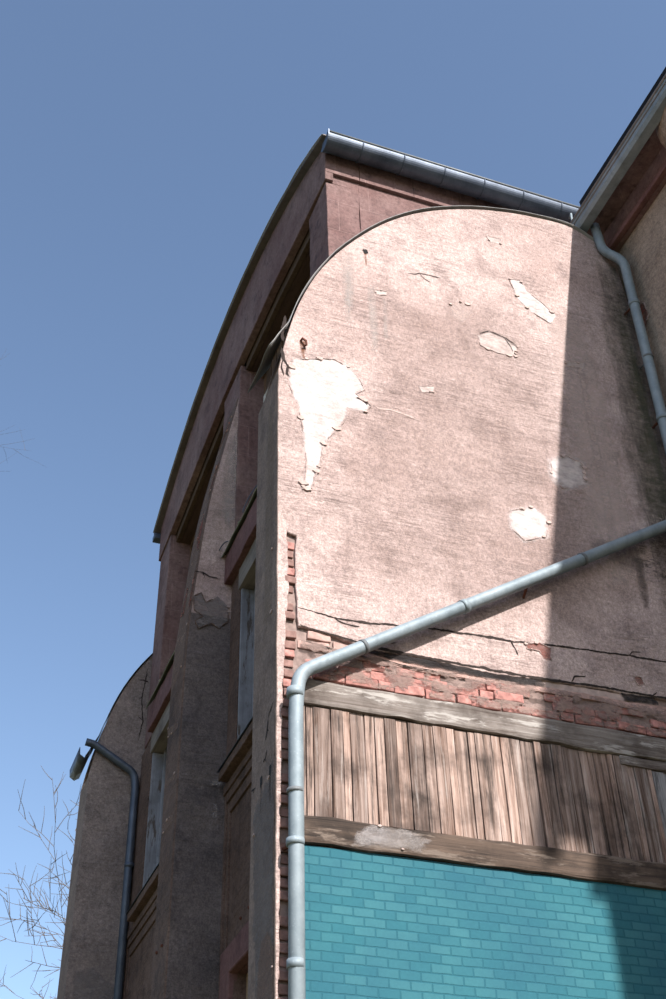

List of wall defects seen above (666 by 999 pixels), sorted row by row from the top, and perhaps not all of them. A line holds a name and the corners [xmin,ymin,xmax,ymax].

flaking render [508,278,555,323]
flaking render [477,331,519,358]
flaking render [288,356,372,491]
flaking render [550,454,589,489]
flaking render [510,505,552,541]
flaking render [171,416,232,694]
crack [296,606,666,699]
spalling [524,641,552,660]
spalling [309,653,666,739]
flaking render [252,542,348,999]
peeling [357,824,429,850]